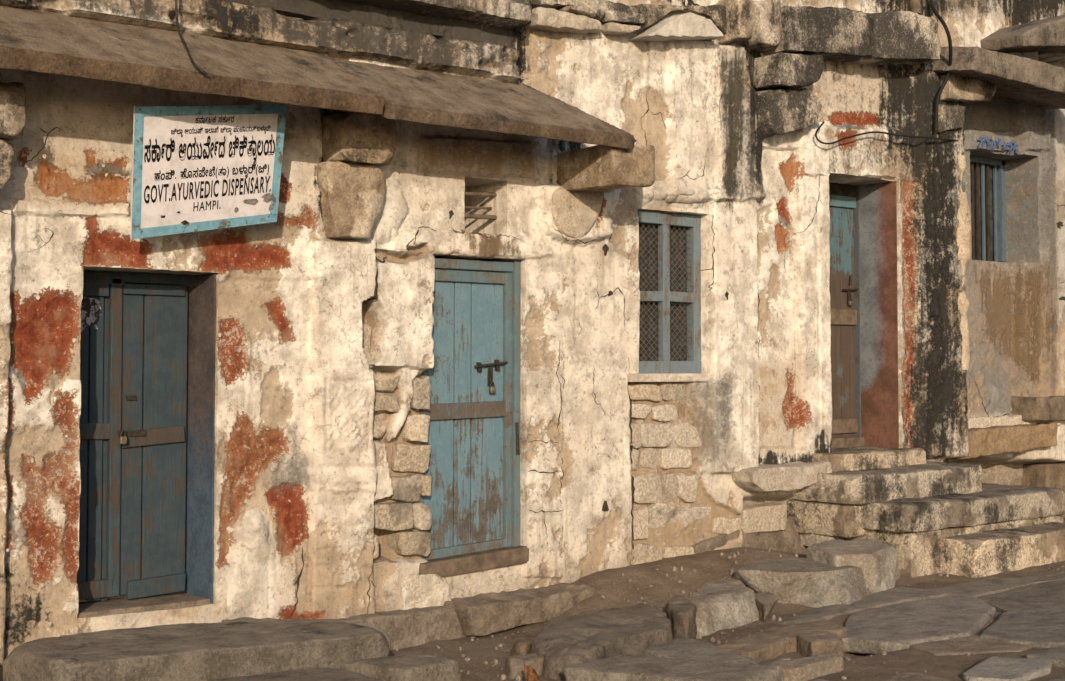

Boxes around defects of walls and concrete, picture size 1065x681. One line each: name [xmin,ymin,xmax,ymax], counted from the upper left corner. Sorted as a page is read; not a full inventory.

water stain [721,49,762,212]
peeling [827,110,883,151]
peeling [13,147,158,270]
peeling [216,317,252,390]
peeling [261,296,296,345]
peeling [773,151,807,254]
water stain [878,63,968,460]
peeling [1,284,81,593]
peeling [215,409,313,568]
water stain [0,565,52,645]